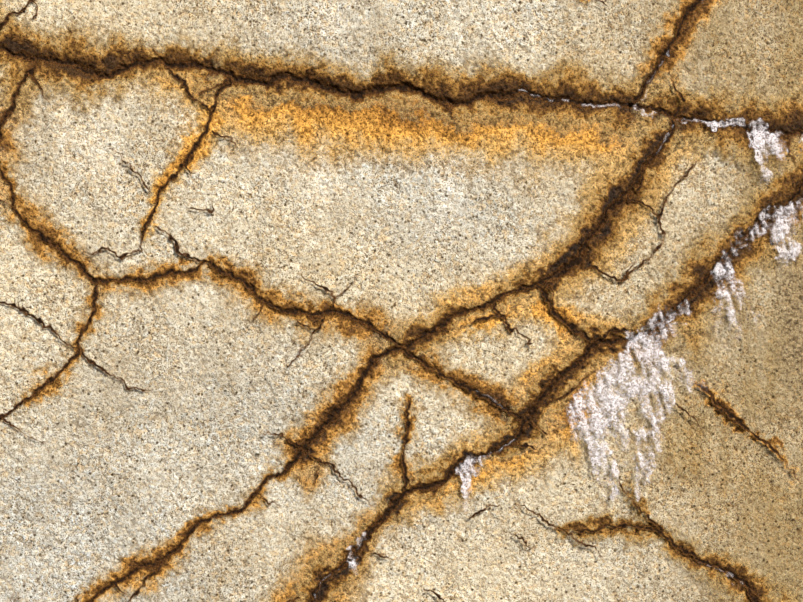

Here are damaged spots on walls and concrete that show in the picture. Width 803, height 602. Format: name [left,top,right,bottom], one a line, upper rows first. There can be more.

crack [0,0,704,260]
leakage [706,118,782,178]
crack [718,121,803,163]
corrosion [72,480,269,602]
corrosion [0,0,695,466]
crack [0,106,714,602]
leakage [456,457,483,499]
corrosion [259,0,803,602]
crack [310,182,803,602]
leakage [568,312,691,480]
leakage [714,263,744,322]